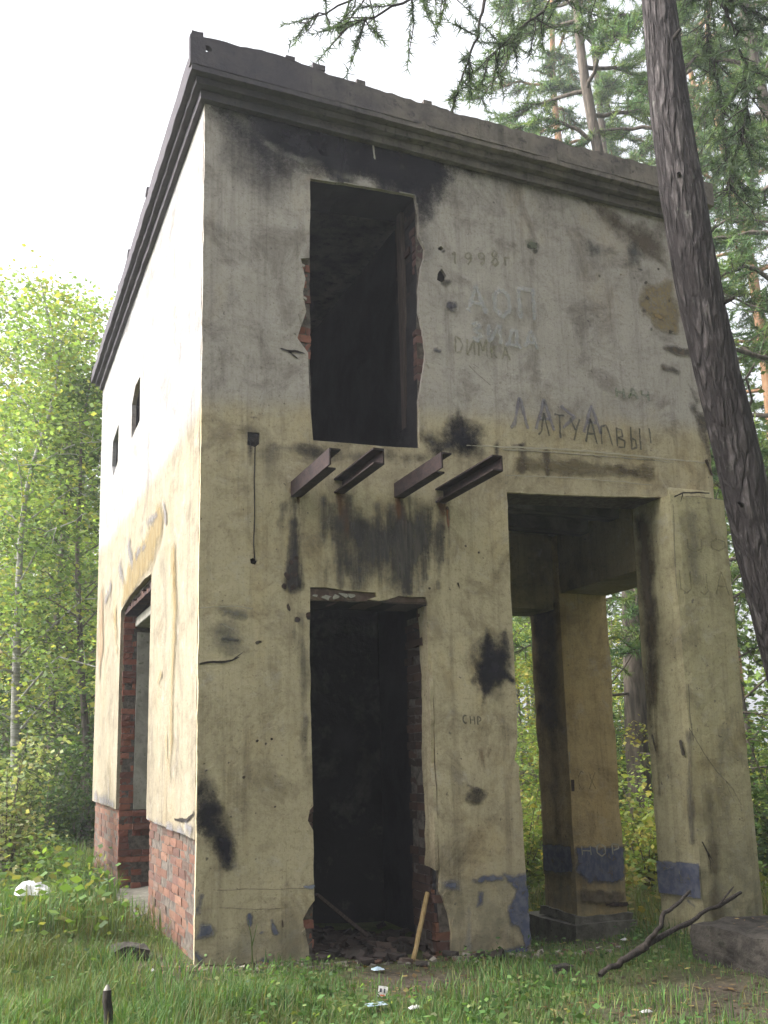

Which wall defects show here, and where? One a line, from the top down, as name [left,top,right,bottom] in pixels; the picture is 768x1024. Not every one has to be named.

water stain [216,106,447,199]
spalling [298,264,311,359]
crack [281,348,304,359]
water stain [425,417,475,454]
water stain [282,497,310,622]
water stain [322,496,444,594]
crack [199,653,242,665]
water stain [478,633,515,696]
peeling [476,874,531,953]
peeling [542,844,628,907]
peeling [656,861,701,904]